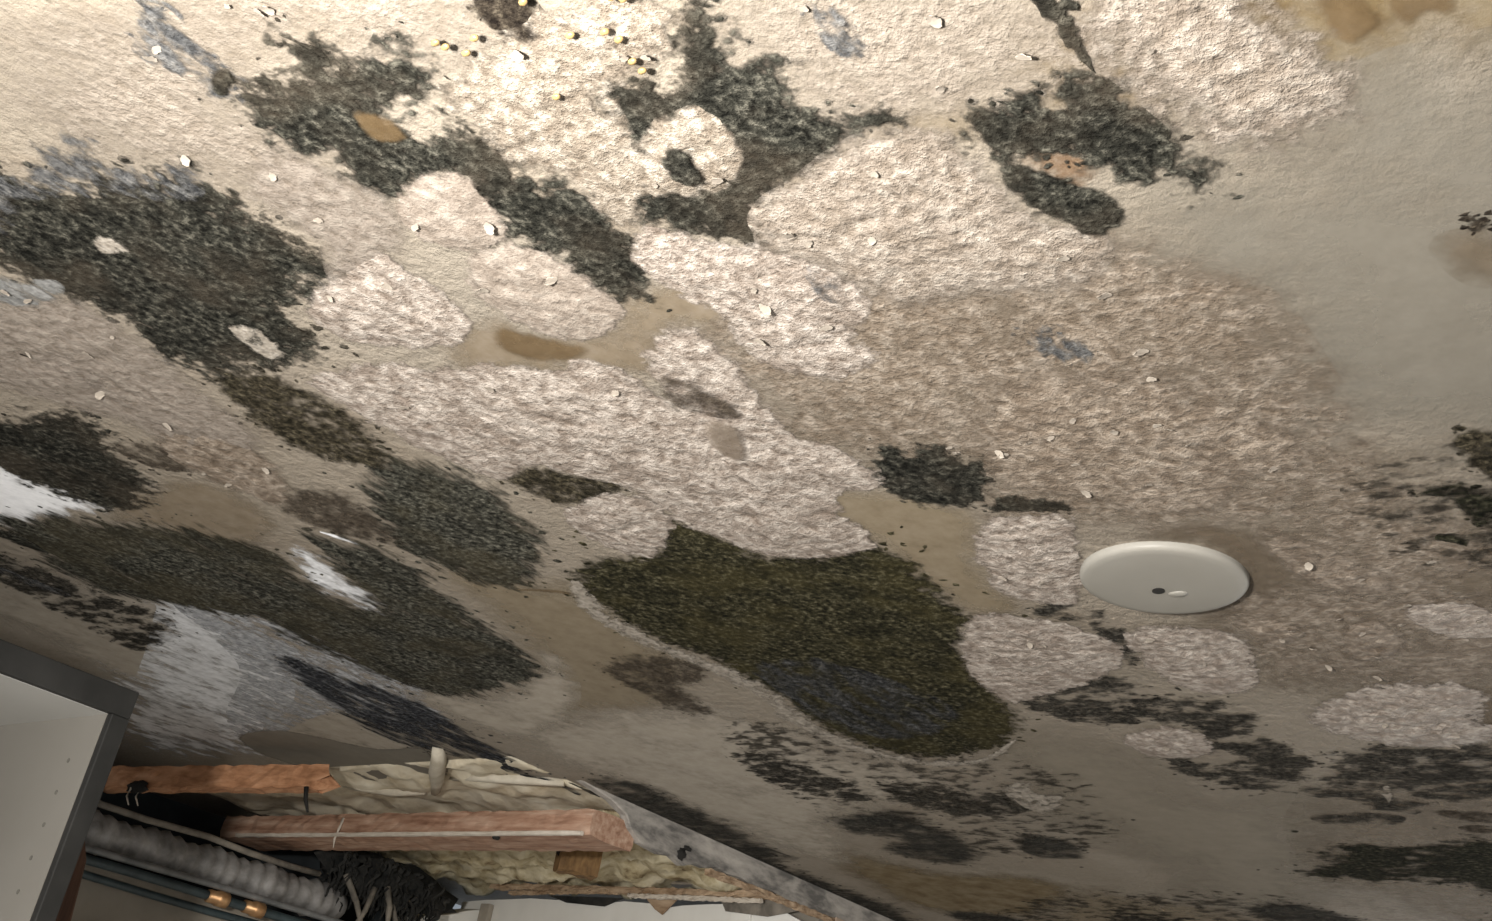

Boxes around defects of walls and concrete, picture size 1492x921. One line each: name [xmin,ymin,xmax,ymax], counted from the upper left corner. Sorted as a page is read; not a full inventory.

flaking render [689,249,1492,688]
peeling [294,550,383,615]
water stain [1022,603,1140,666]
water stain [1021,676,1325,795]
water stain [960,815,1090,859]
water stain [798,872,907,921]